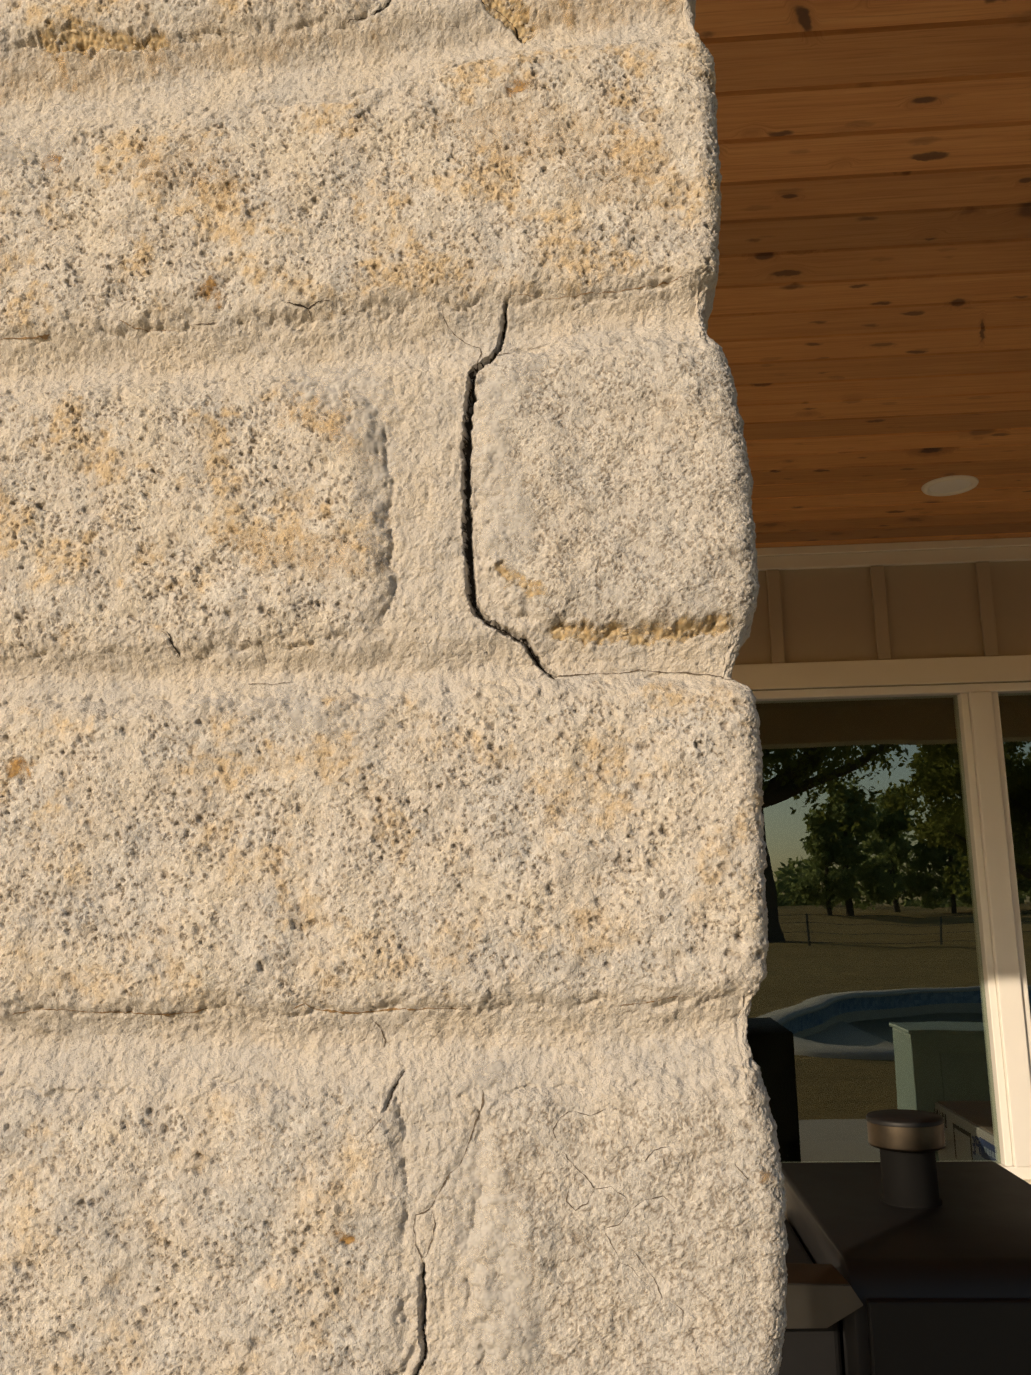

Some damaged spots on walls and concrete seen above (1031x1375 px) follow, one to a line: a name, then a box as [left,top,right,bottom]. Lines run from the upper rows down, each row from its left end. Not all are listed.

crack [347,0,391,23]
spalling [482,0,535,44]
crack [441,276,735,680]
crack [9,1008,204,1016]
crack [293,1003,455,1140]
crack [413,1090,484,1375]